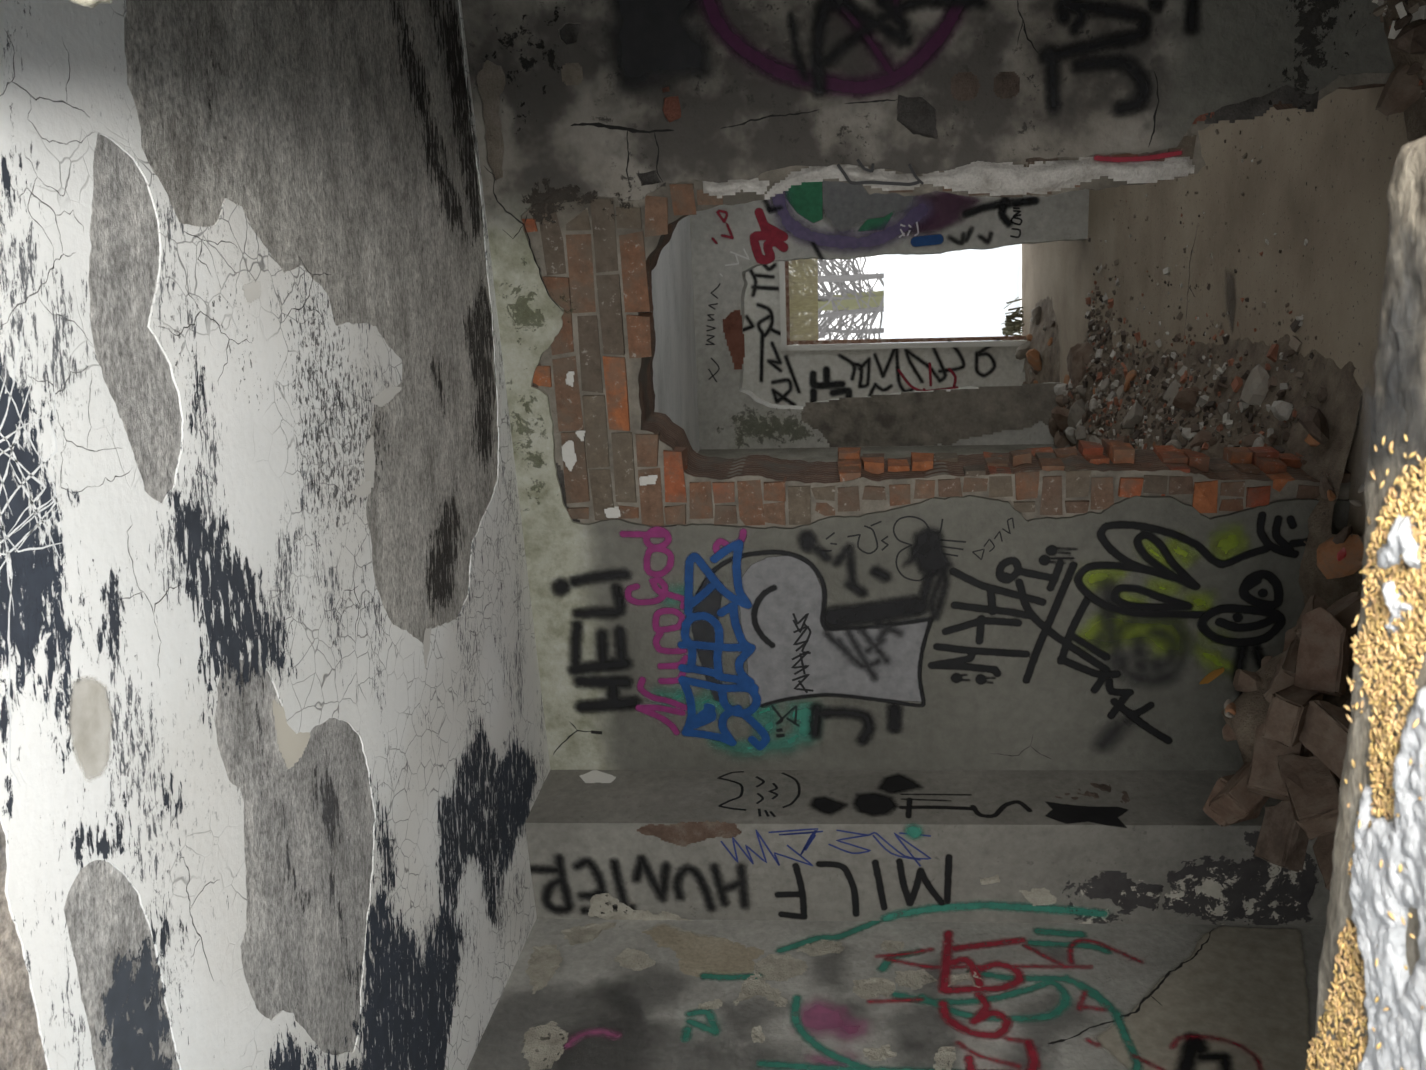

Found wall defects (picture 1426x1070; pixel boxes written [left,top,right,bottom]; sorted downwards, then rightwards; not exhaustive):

crack [0,29,130,494]
crack [158,231,251,382]
peeling [88,0,506,669]
crack [281,256,331,336]
flaking render [522,85,1351,526]
crack [106,521,183,673]
crack [335,551,360,641]
peeling [64,860,189,1070]
crack [179,849,217,981]
peeling [214,659,375,1055]
crack [1048,928,1214,1044]
spalling [1019,830,1321,925]